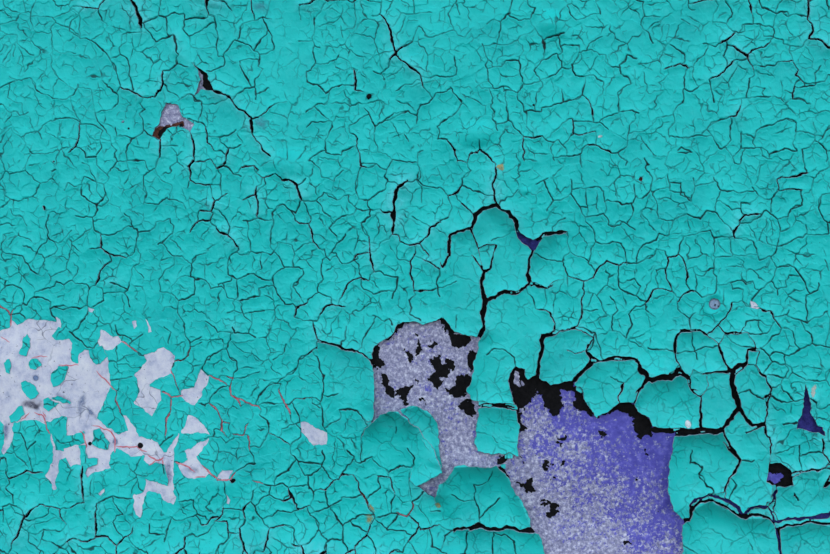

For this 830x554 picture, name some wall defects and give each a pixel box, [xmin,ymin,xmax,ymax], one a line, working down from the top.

peeling [153,103,194,141]
crack [189,91,302,247]
crack [381,141,566,325]
crack [294,237,374,357]
crack [536,260,627,376]
peeling [0,317,236,517]
peeling [301,422,327,445]
peeling [370,207,830,554]
crack [571,303,772,478]
crack [12,468,133,552]
crack [390,502,510,553]
crack [690,490,830,554]